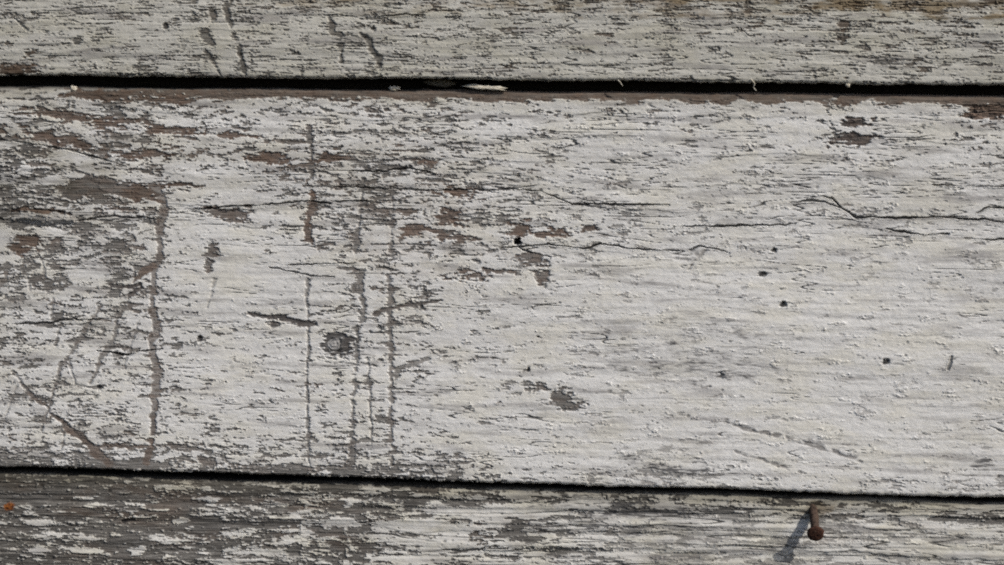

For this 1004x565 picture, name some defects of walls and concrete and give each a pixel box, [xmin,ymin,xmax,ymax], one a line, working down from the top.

peeling [0,48,47,76]
peeling [68,35,85,46]
peeling [188,0,248,77]
peeling [326,14,346,64]
peeling [358,25,384,71]
peeling [832,20,853,46]
peeling [914,66,936,77]
peeling [964,36,1004,84]
peeling [54,83,1004,149]
crack [74,166,1004,258]
peeling [0,106,626,565]